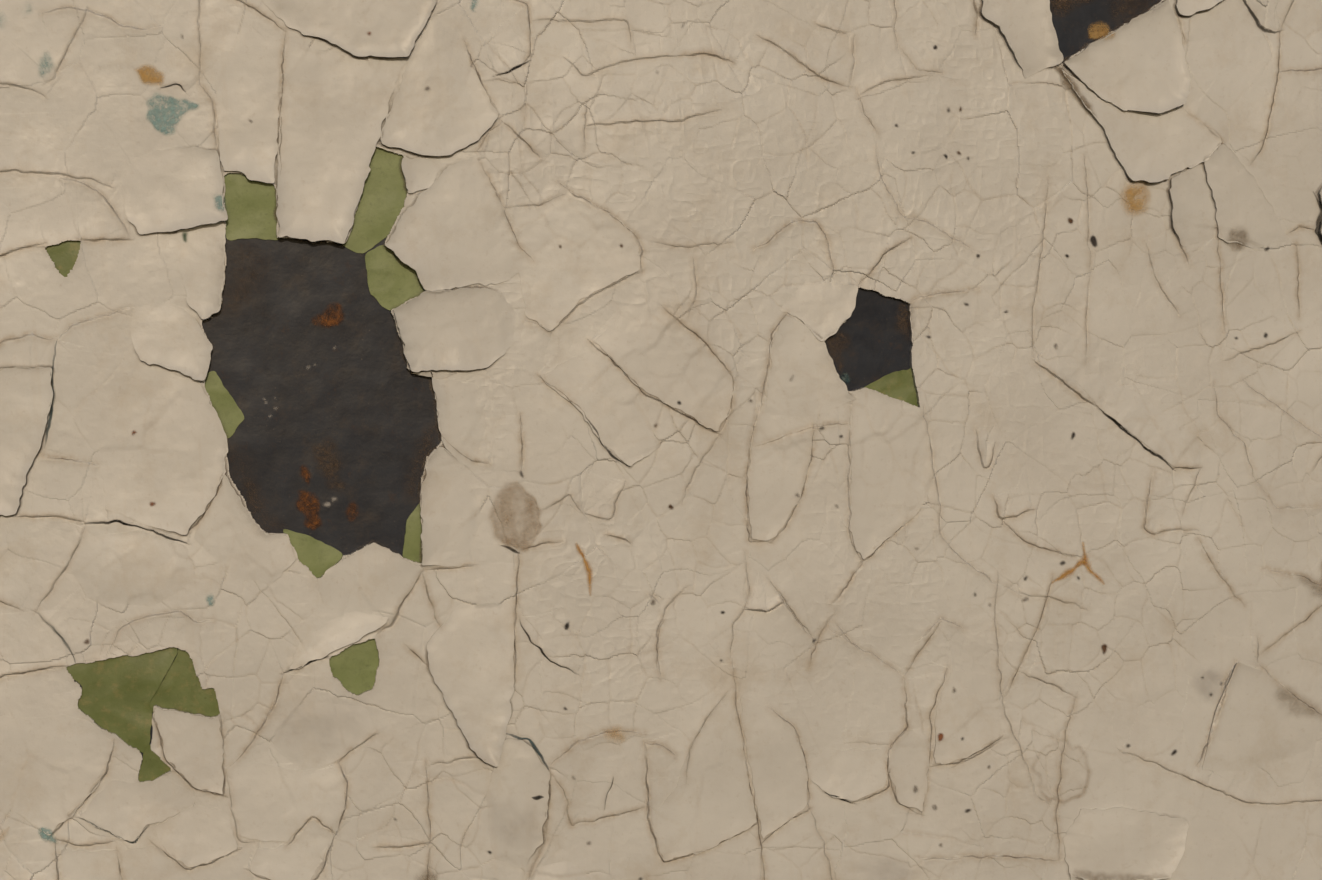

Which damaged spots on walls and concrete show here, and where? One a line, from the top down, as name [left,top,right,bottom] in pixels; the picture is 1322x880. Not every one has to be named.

crack [1245,2,1265,30]
peeling [979,0,1289,249]
crack [1314,206,1322,244]
peeling [45,240,81,277]
peeling [99,0,640,695]
crack [45,369,53,433]
peeling [540,311,733,466]
peeling [747,281,933,559]
crack [1103,412,1166,461]
crack [102,520,183,542]
peeling [0,647,346,880]
crack [512,735,547,800]